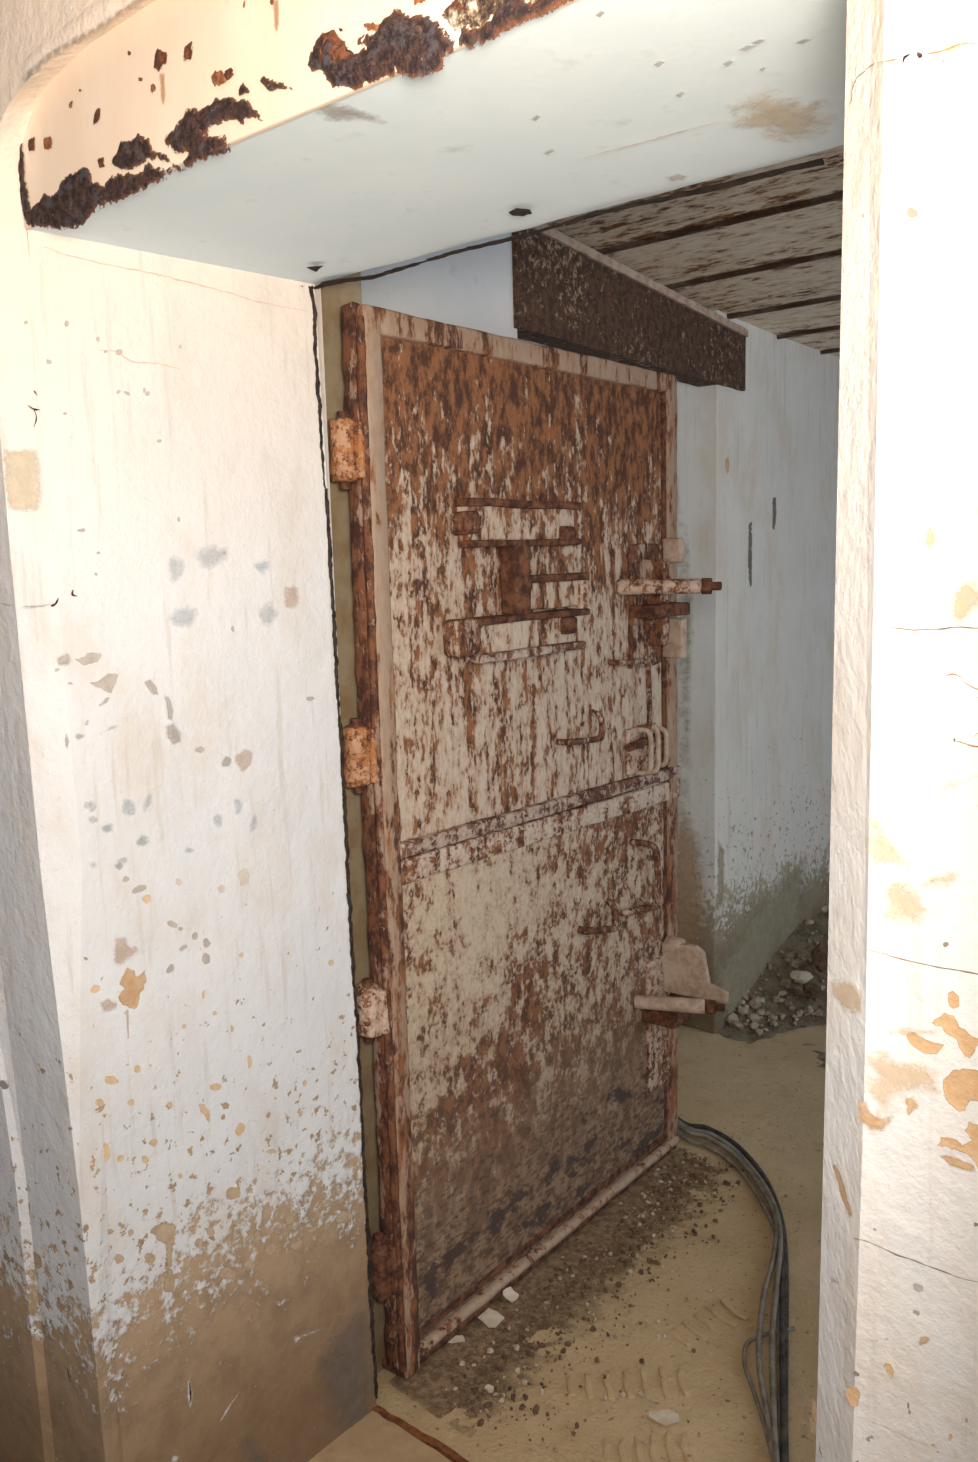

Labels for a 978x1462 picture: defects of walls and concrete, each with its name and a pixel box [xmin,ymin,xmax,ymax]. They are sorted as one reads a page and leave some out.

rust [138,42,193,102]
rust [307,8,445,91]
rust [18,68,293,231]
crack [876,624,978,632]
crack [867,949,978,975]
peeling [837,985,859,1007]
peeling [907,991,978,1170]
peeling [833,1165,851,1216]
crack [854,1238,977,1282]